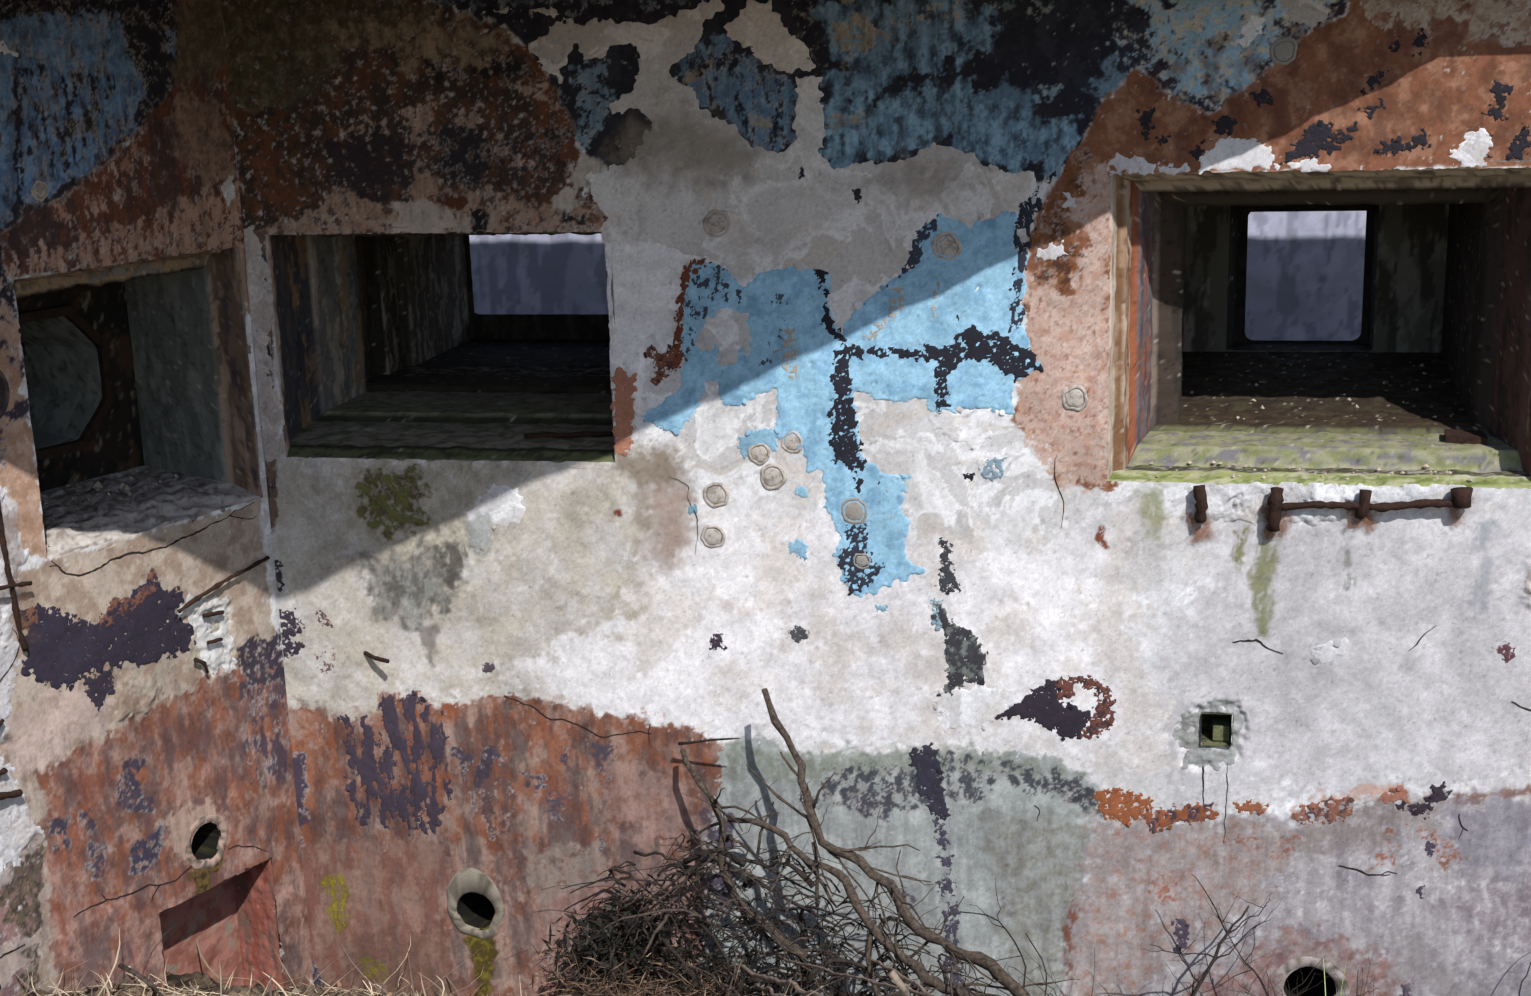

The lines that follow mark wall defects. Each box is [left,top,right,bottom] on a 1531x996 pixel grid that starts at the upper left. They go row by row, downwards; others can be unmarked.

peeling [1230,15,1266,48]
peeling [1107,70,1389,176]
spalling [221,169,285,462]
crack [51,502,257,577]
peeling [528,0,1116,996]
rust [1185,513,1212,542]
rust [1260,505,1291,539]
rust [1348,509,1374,531]
rust [1450,499,1472,526]
leakage [1250,543,1276,635]
peeling [0,487,336,880]
peeling [337,690,453,836]